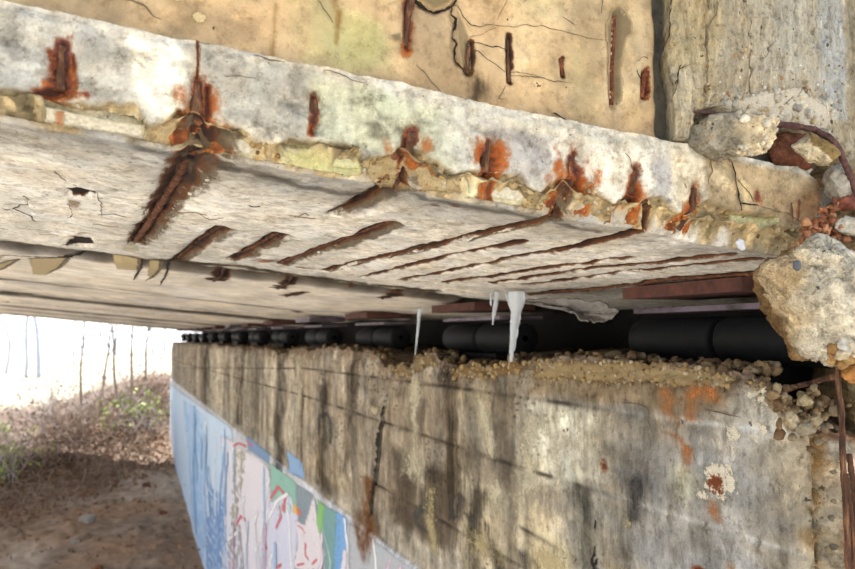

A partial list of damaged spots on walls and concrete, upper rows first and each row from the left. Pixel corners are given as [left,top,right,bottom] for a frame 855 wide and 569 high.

corrosion [32,35,90,104]
spalling [45,104,158,141]
corrosion [168,40,233,155]
spalling [103,113,765,300]
corrosion [470,136,511,201]
crack [451,0,601,98]
corrosion [544,144,602,218]
spalling [694,55,855,237]
water stain [316,384,332,496]
water stain [405,361,462,553]
water stain [466,414,547,569]
spalling [450,358,855,569]